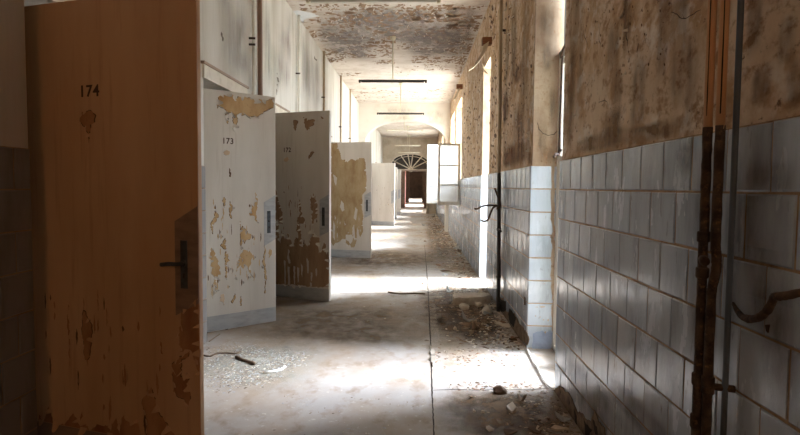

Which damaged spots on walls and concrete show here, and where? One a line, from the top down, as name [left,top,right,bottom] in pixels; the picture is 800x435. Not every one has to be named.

peeling [216,77,279,133]
peeling [293,117,324,132]
peeling [297,2,517,78]
peeling [463,52,539,178]
crack [671,0,725,116]
peeling [208,143,368,306]